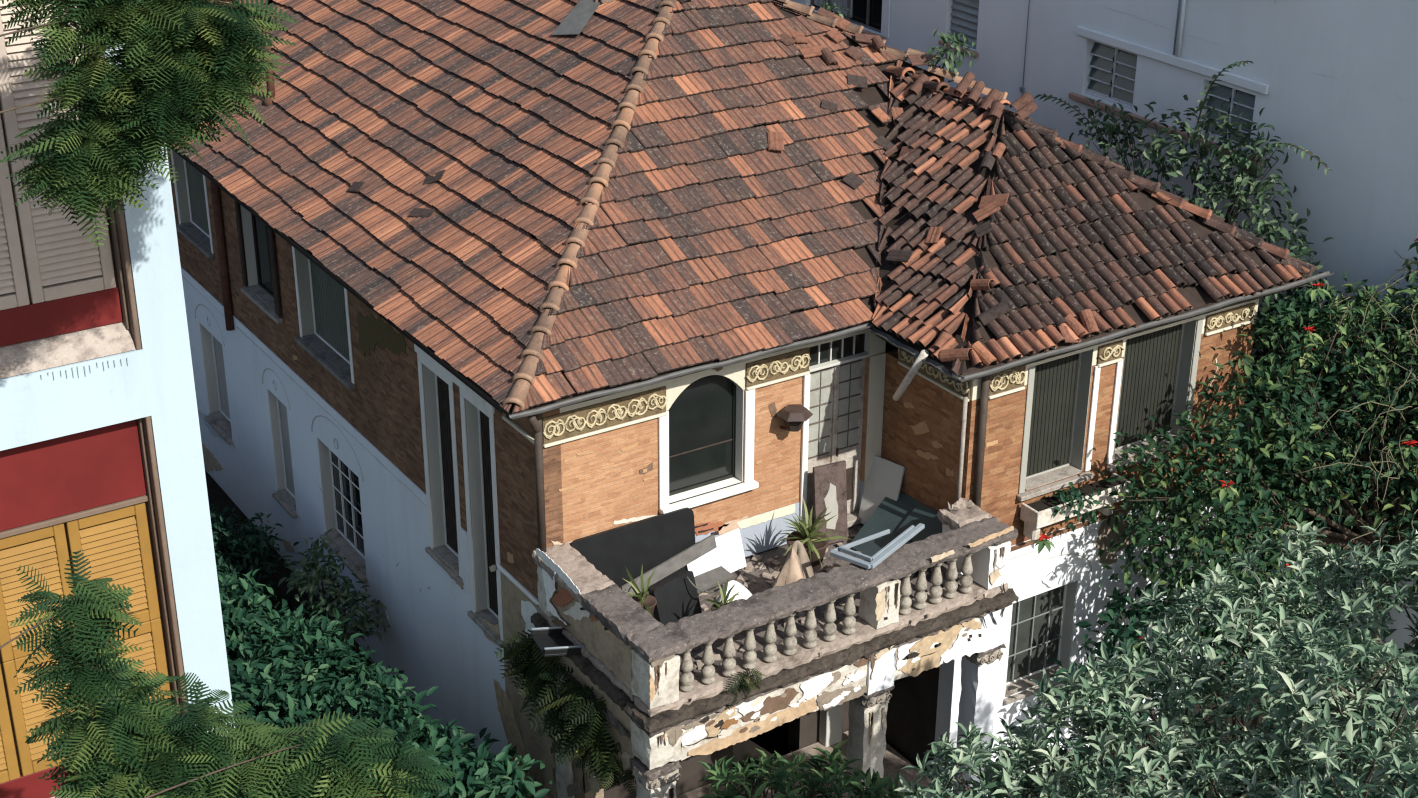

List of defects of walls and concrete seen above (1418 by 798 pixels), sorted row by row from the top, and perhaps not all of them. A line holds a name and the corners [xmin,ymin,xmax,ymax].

peeling [521,548,618,639]
spalling [896,619,1003,677]
spalling [681,670,867,756]